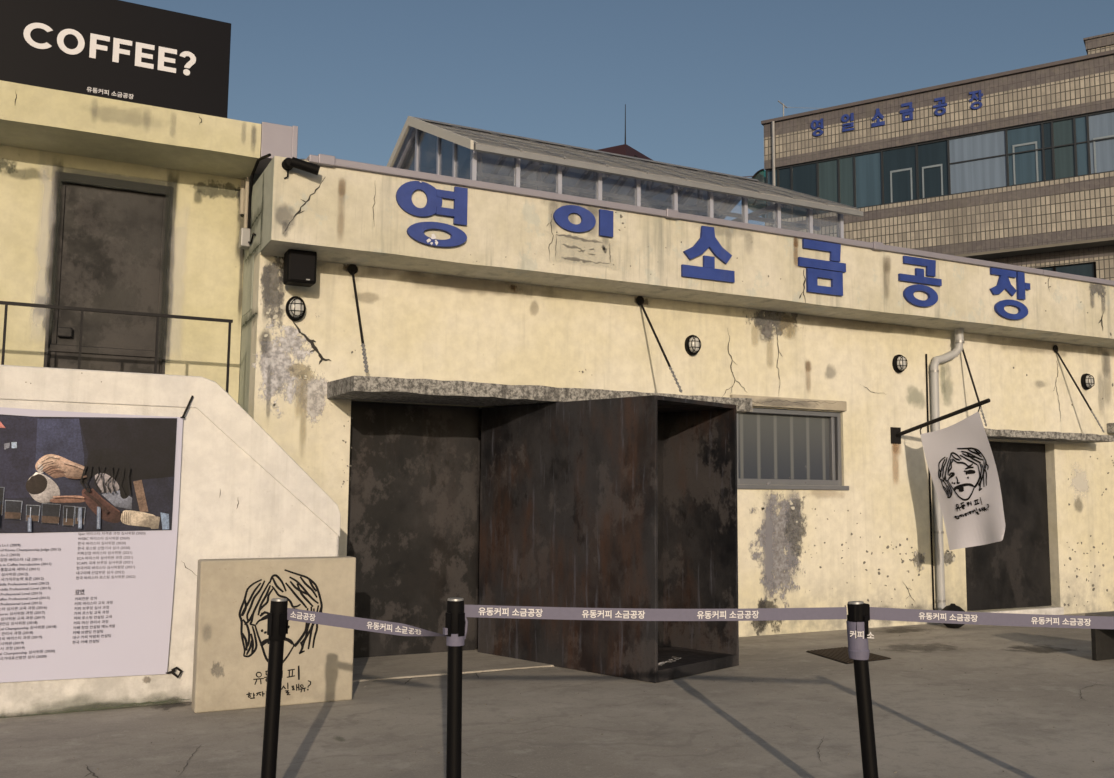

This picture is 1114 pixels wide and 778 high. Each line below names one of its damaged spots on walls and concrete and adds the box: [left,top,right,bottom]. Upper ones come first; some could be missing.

crack [285,178,325,231]
crack [293,321,331,364]
damp [289,364,313,380]
crack [722,335,836,406]
damp [751,599,781,636]